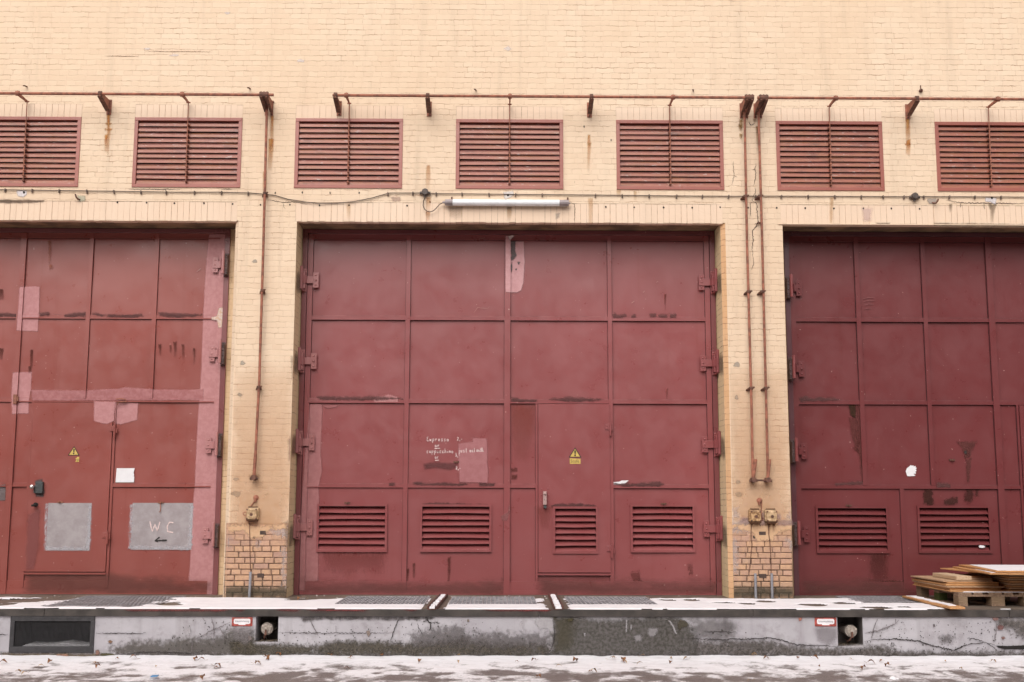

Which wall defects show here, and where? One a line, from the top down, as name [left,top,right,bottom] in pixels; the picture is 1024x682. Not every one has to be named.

crack [733,166,759,268]
peeling [508,235,520,272]
crack [864,619,998,651]